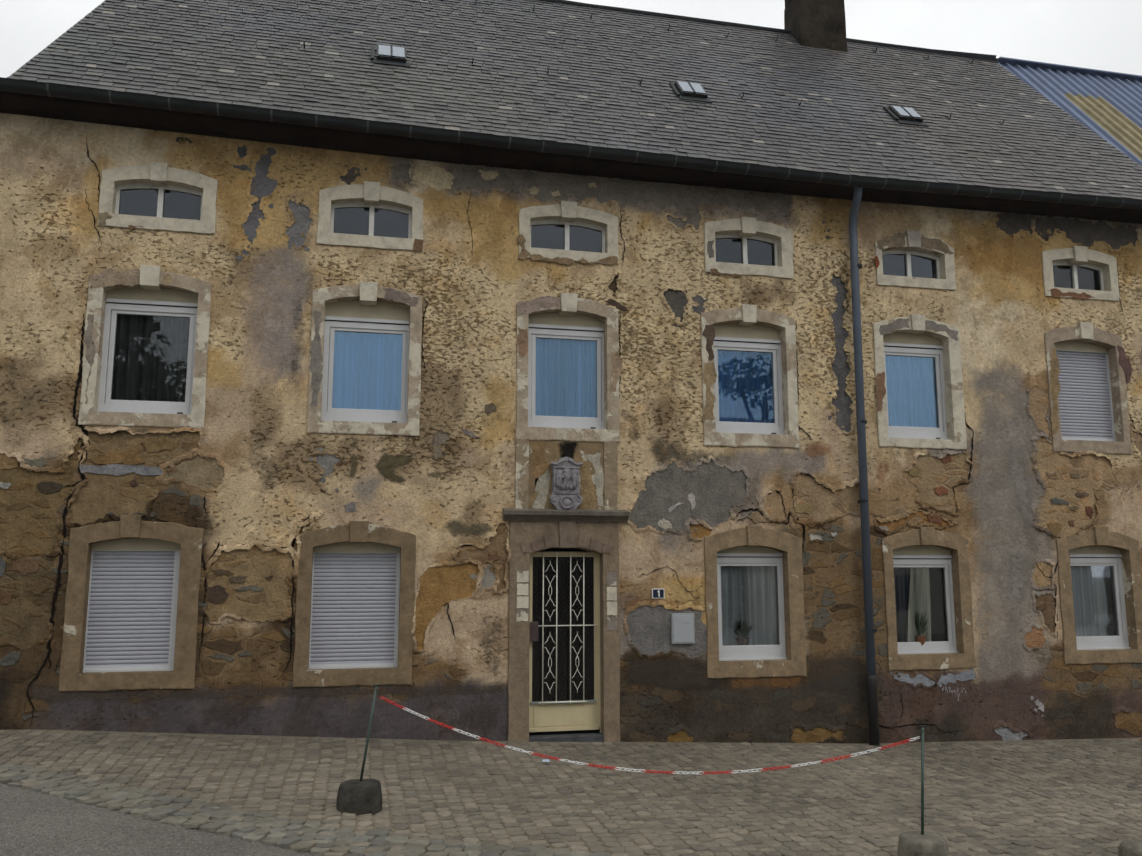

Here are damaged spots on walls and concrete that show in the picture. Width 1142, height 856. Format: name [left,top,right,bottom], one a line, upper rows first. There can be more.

crack [85,138,102,245]
flaking render [233,144,317,262]
flaking render [994,212,1142,255]
flaking render [658,284,717,421]
flaking render [826,271,854,436]
crack [26,314,90,724]
flaking render [411,520,512,654]
crack [736,473,831,552]
flaking render [625,450,974,544]
water stain [976,368,1040,673]